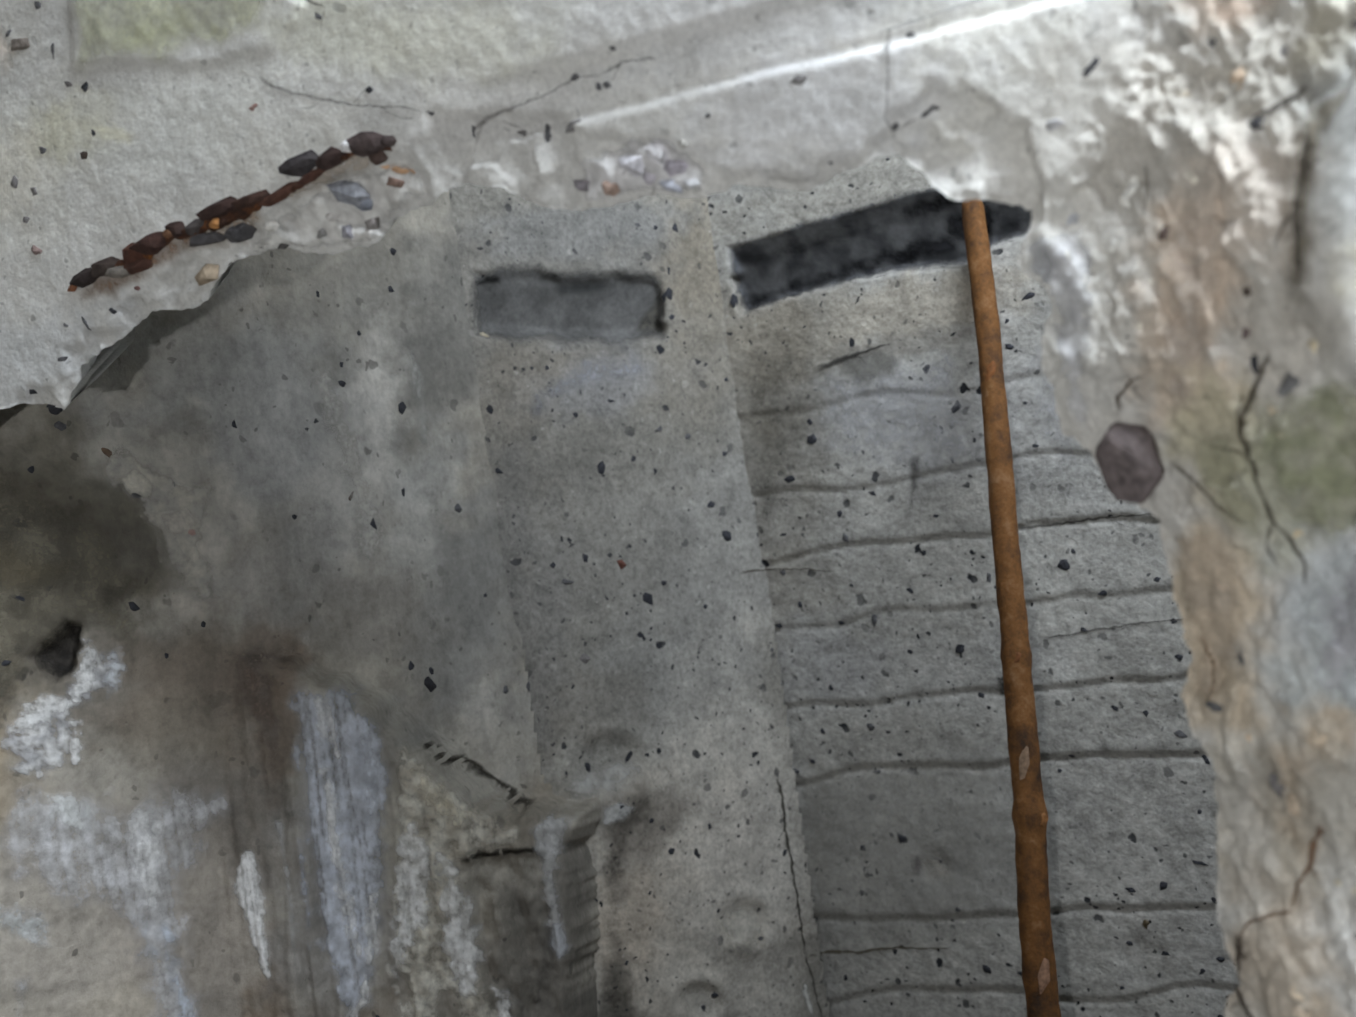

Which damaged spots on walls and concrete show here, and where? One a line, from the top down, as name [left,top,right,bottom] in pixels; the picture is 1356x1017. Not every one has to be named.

rust [67,131,397,292]
spalling [252,165,422,251]
peeling [104,450,211,598]
spalling [1057,548,1076,570]
crack [1179,358,1306,583]
spalling [35,624,81,679]
water stain [3,649,124,778]
water stain [6,795,225,1017]
water stain [236,852,270,977]
water stain [291,690,517,1017]
water stain [534,816,567,958]
crack [1235,828,1323,1017]